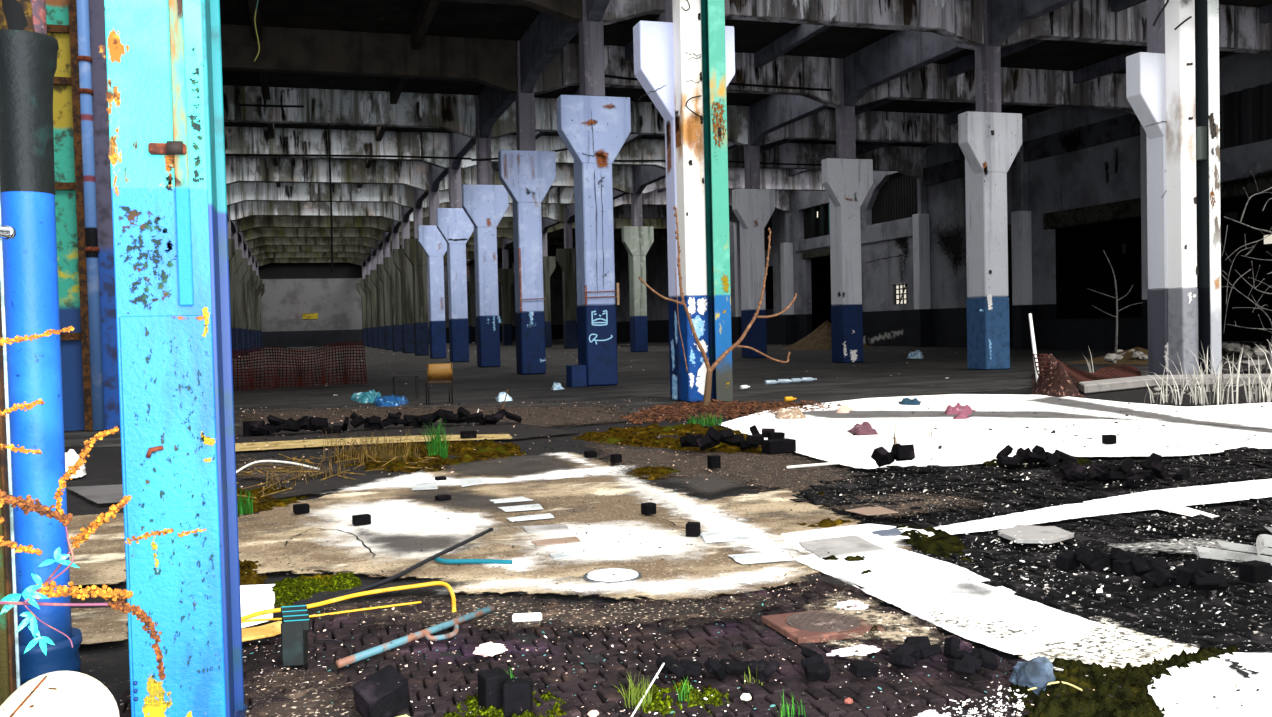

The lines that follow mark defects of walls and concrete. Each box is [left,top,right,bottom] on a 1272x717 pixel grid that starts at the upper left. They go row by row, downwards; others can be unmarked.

water stain [879,0,921,26]
water stain [1127,7,1147,41]
rust [99,28,129,63]
water stain [736,58,780,89]
water stain [957,69,975,97]
rust [106,79,137,196]
rust [666,98,727,173]
rust [148,155,174,189]
rust [595,150,608,168]
peeling [118,206,177,314]
peeling [671,297,709,400]
spalling [133,327,222,689]